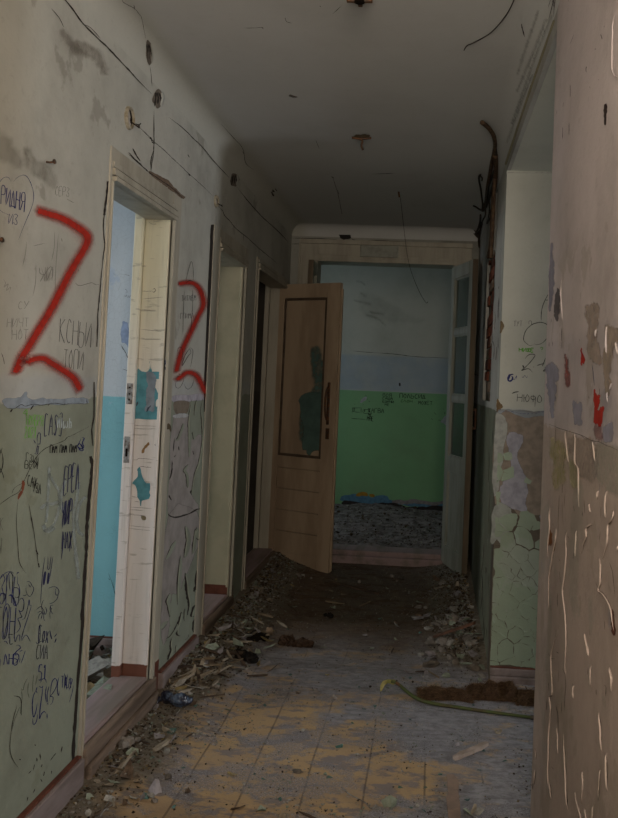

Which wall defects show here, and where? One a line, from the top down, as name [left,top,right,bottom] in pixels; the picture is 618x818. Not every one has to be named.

peeling [132,467,150,506]
peeling [135,360,166,420]
crack [129,399,204,660]
peeling [161,394,204,645]
peeling [482,243,560,668]
crack [523,424,618,818]
spalling [585,303,618,396]